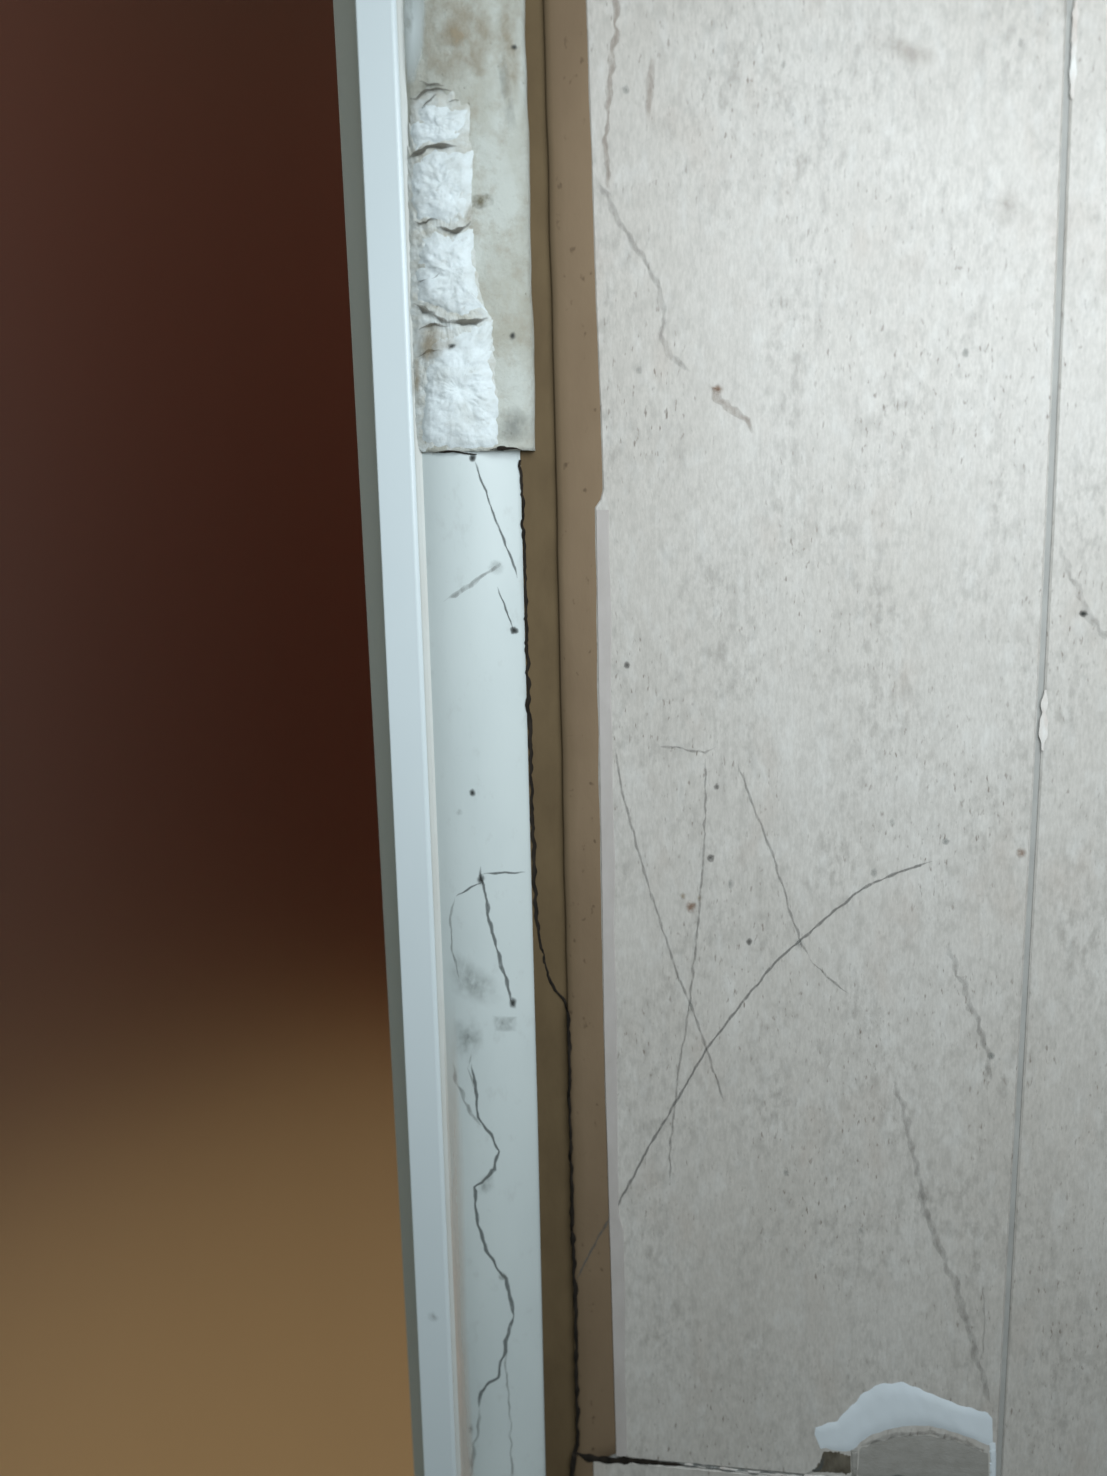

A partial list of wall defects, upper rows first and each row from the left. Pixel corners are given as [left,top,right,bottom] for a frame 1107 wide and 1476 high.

spalling [403,0,535,455]
crack [439,446,769,1476]
spalling [804,1382,996,1476]